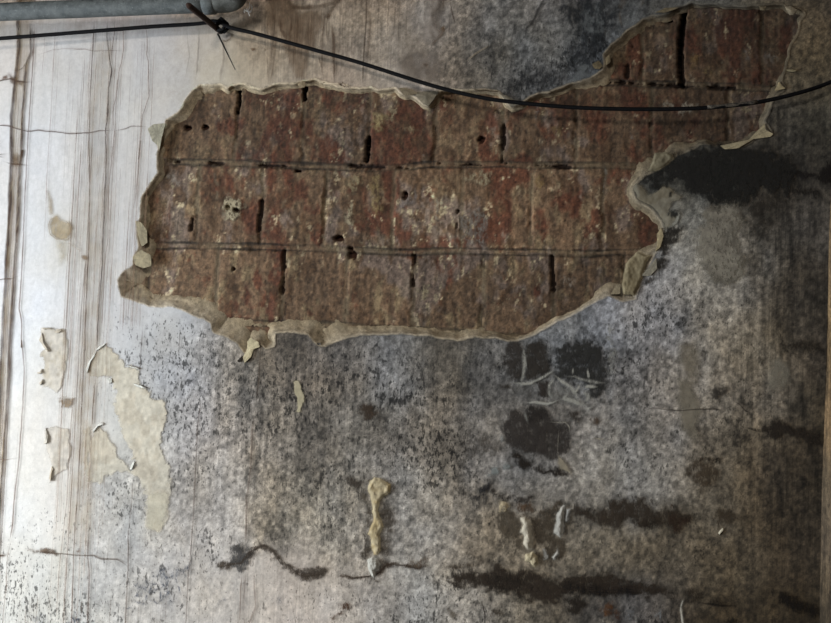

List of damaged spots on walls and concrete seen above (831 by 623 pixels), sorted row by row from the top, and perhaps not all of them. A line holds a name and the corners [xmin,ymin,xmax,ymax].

crack [0,125,103,134]
flaking render [116,0,807,363]
water stain [644,143,831,236]
water stain [643,225,682,284]
peeling [37,328,68,393]
peeling [44,426,71,482]
peeling [83,343,171,532]
water stain [230,543,255,573]
crack [217,428,428,621]
water stain [344,476,396,582]
water stain [446,337,696,623]
water stain [762,419,825,446]